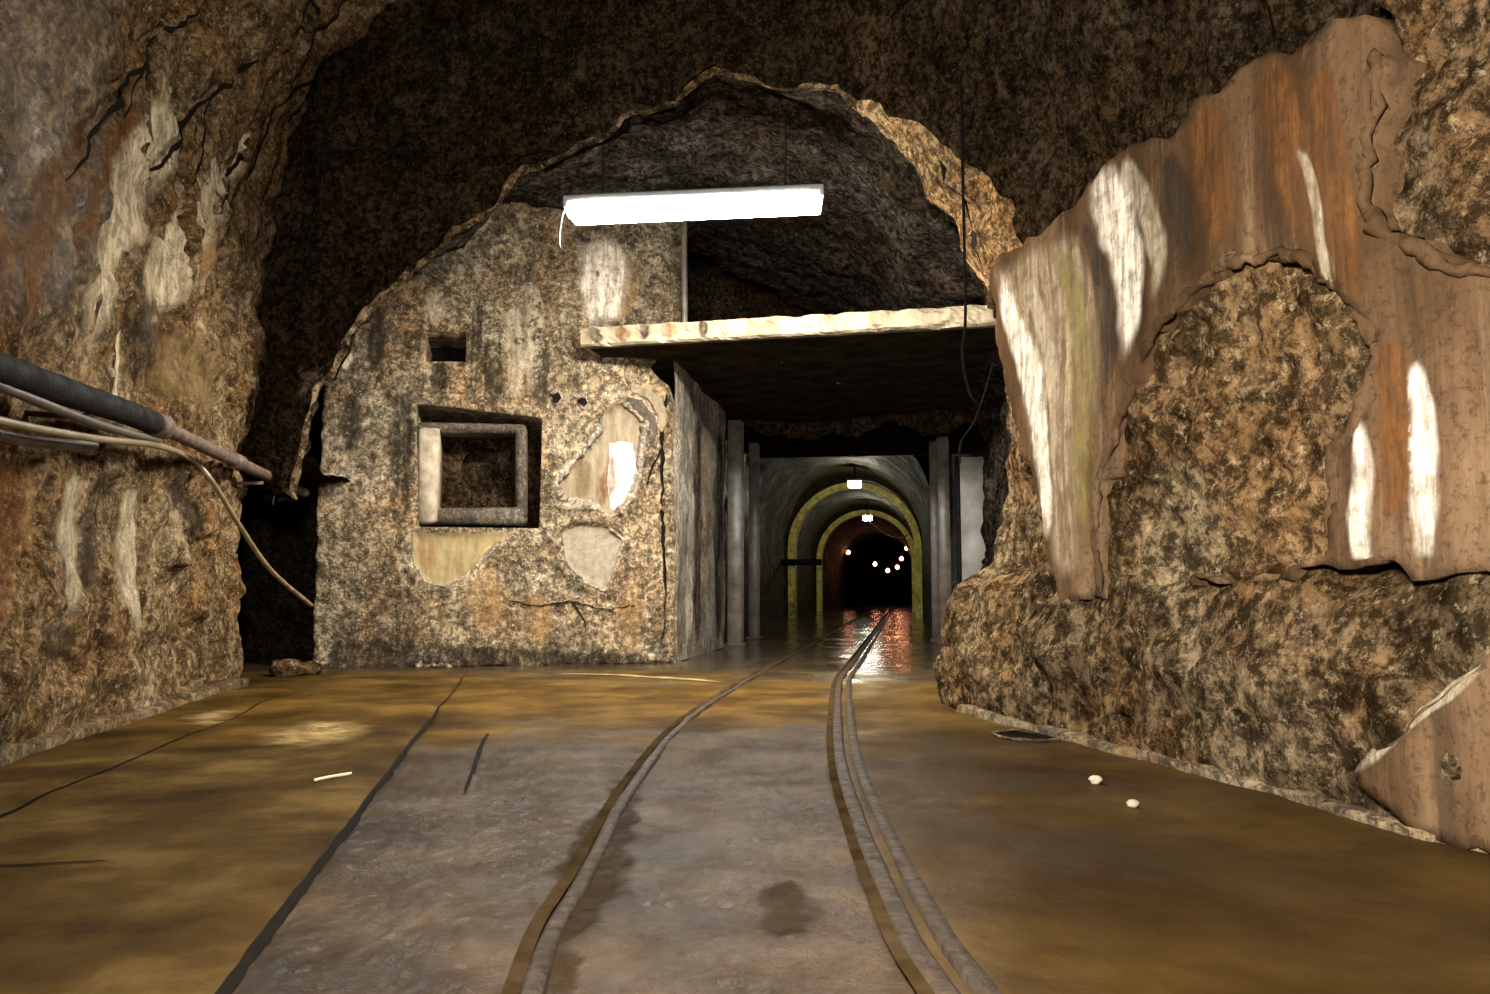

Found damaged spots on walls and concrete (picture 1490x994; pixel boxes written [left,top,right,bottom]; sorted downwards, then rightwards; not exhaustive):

flaking render [549,387,667,592]
spalling [1090,246,1382,601]